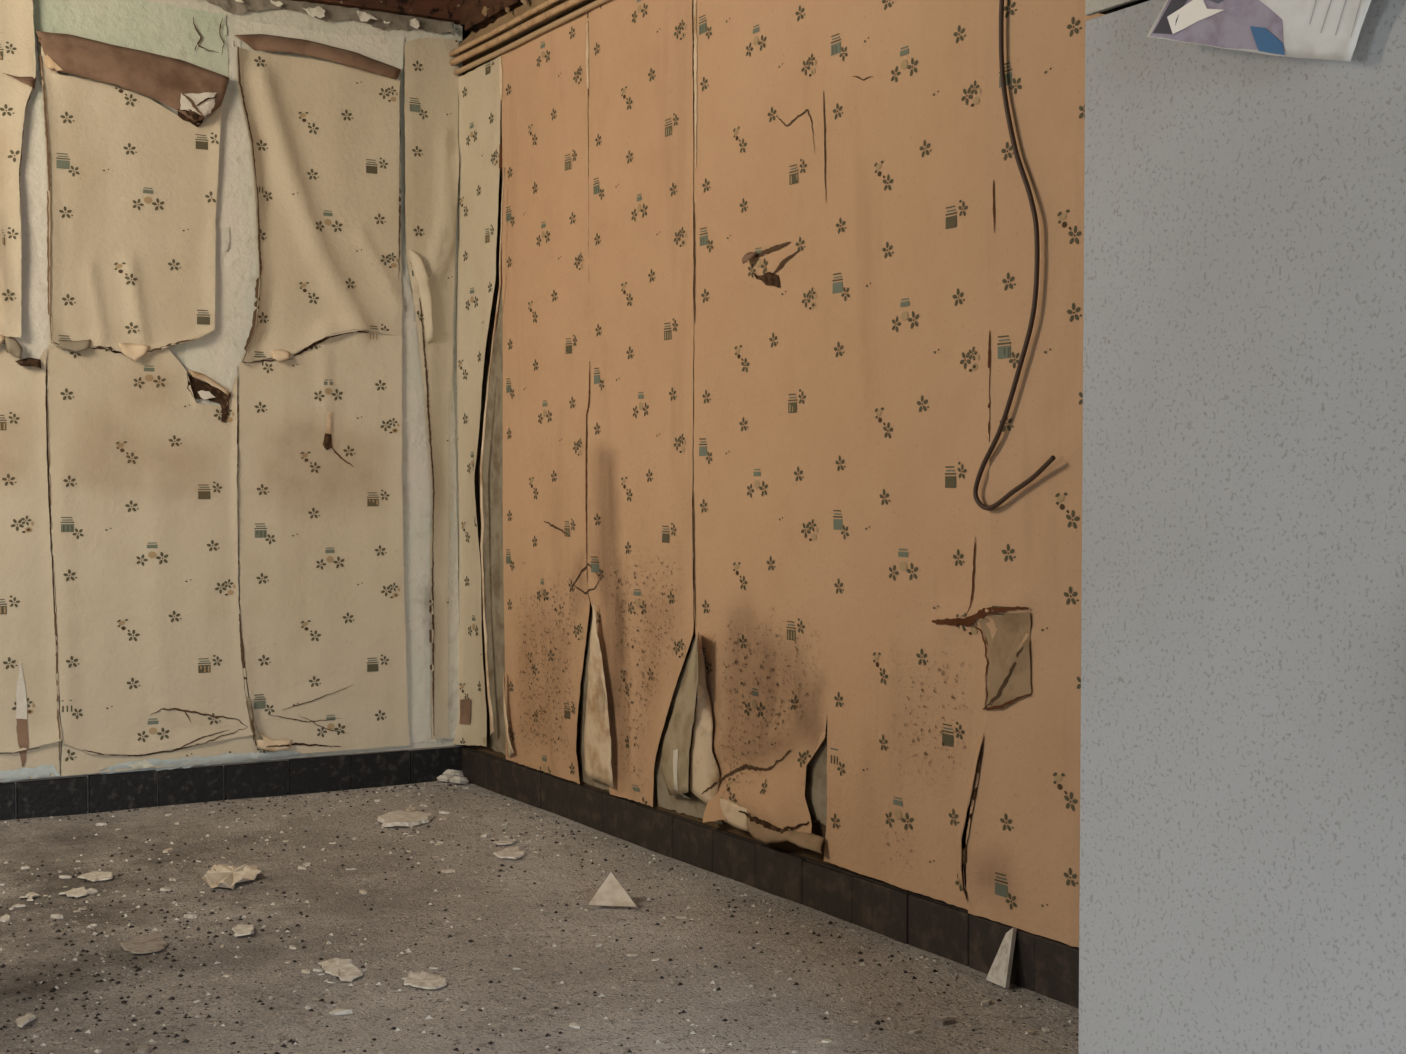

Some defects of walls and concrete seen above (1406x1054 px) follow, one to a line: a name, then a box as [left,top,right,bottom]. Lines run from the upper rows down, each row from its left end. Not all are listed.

flaking render [13,0,568,400]
crack [0,17,352,774]
leakage [520,585,572,751]
leakage [616,558,674,771]
leakage [724,630,807,782]